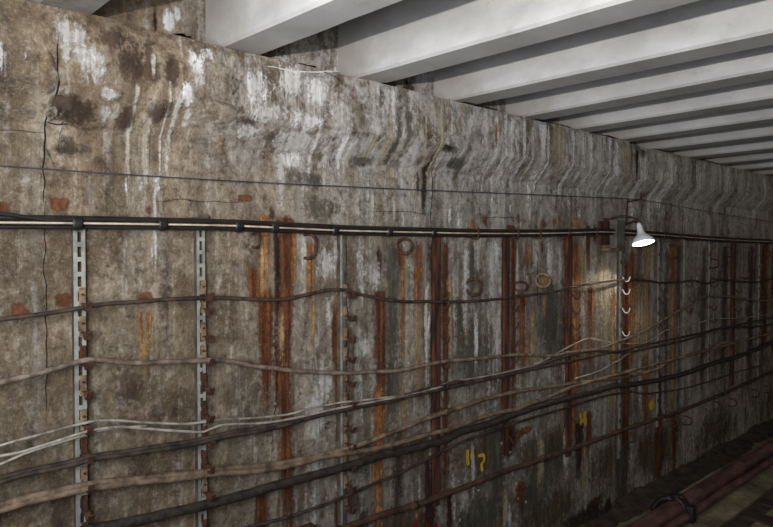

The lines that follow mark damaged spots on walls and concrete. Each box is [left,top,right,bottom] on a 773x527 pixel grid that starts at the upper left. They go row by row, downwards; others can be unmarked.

crack [19,32,67,412]
water stain [49,6,214,263]
corrosion [248,209,296,527]
corrosion [306,244,315,353]
water stain [232,56,413,217]
corrosion [372,291,387,525]
corrosion [399,244,432,424]
corrosion [417,243,453,527]
water stain [416,104,465,212]
corrosion [501,225,548,408]
corrosion [562,215,596,493]
corrosion [609,244,652,496]